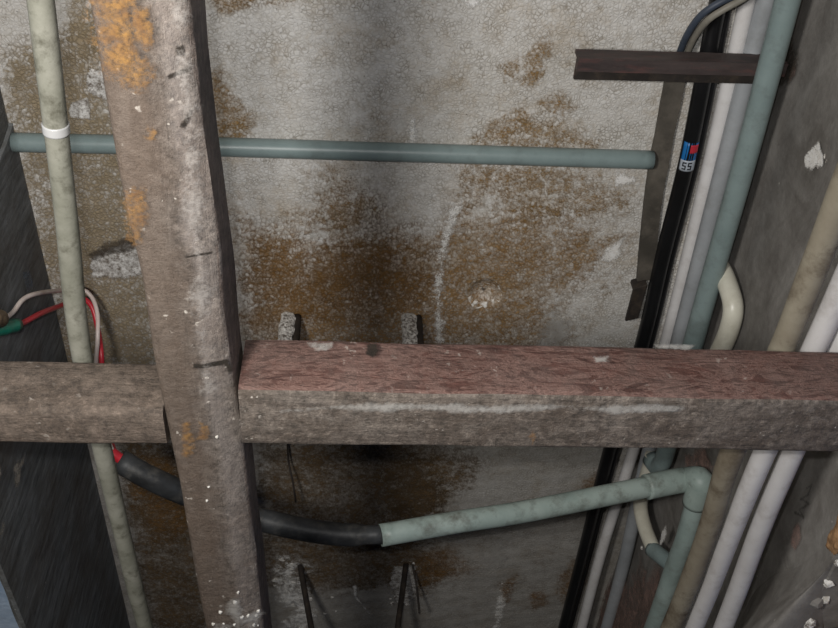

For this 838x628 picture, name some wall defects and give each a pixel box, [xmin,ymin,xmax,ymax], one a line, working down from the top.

corrosion [97,0,150,83]
water stain [505,43,550,85]
water stain [476,95,598,149]
water stain [236,165,628,345]
water stain [257,443,478,525]
water stain [263,534,470,614]